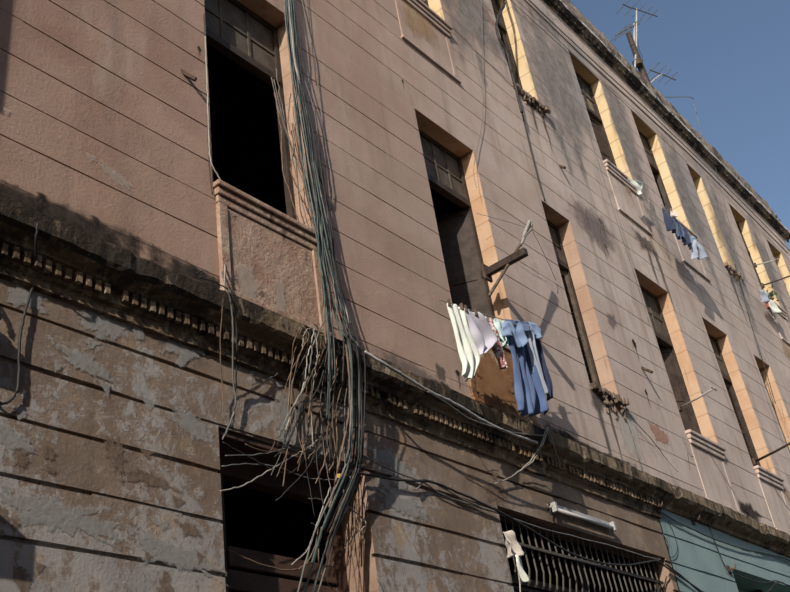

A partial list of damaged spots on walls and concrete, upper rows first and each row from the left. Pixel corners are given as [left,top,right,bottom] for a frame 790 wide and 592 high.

leakage [513,4,588,172]
leakage [0,182,139,254]
leakage [151,245,220,289]
peeling [6,286,47,314]
peeling [48,308,144,396]
peeling [159,338,205,367]
peeling [168,406,214,442]
peeling [120,467,185,506]
leakage [739,502,760,522]
peeling [13,560,46,592]